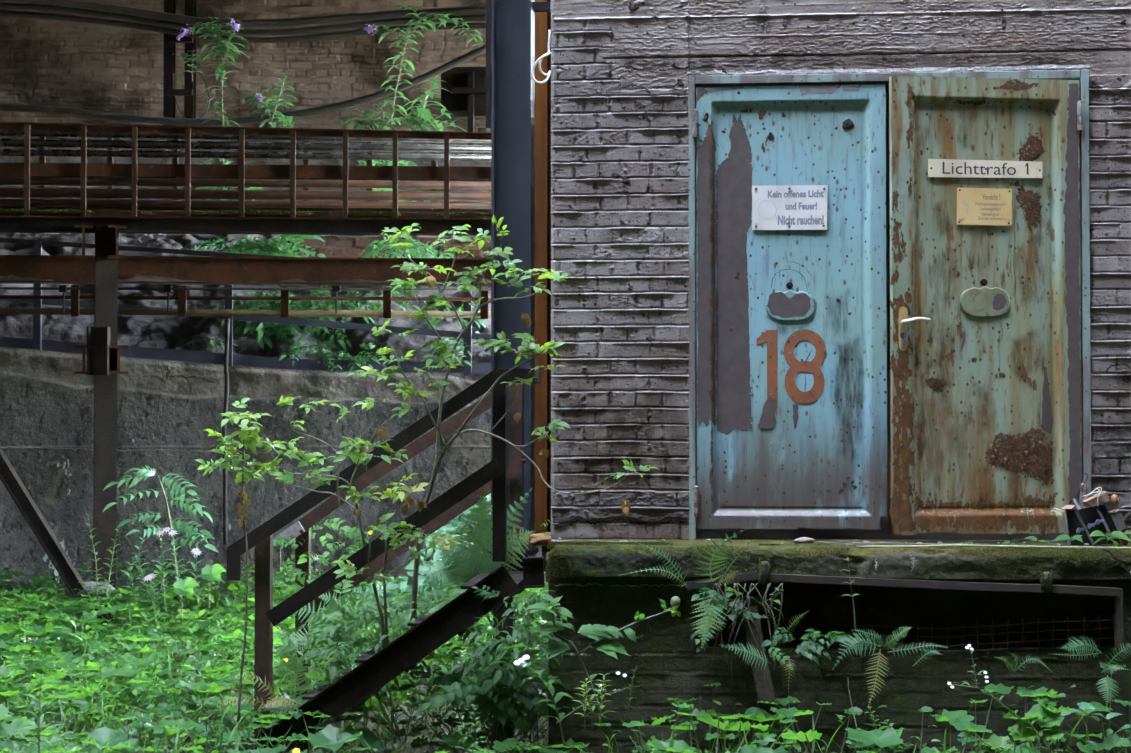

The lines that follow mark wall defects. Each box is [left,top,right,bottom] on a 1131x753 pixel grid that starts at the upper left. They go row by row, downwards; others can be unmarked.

peeling [696,114,776,435]
rust [888,79,1060,536]